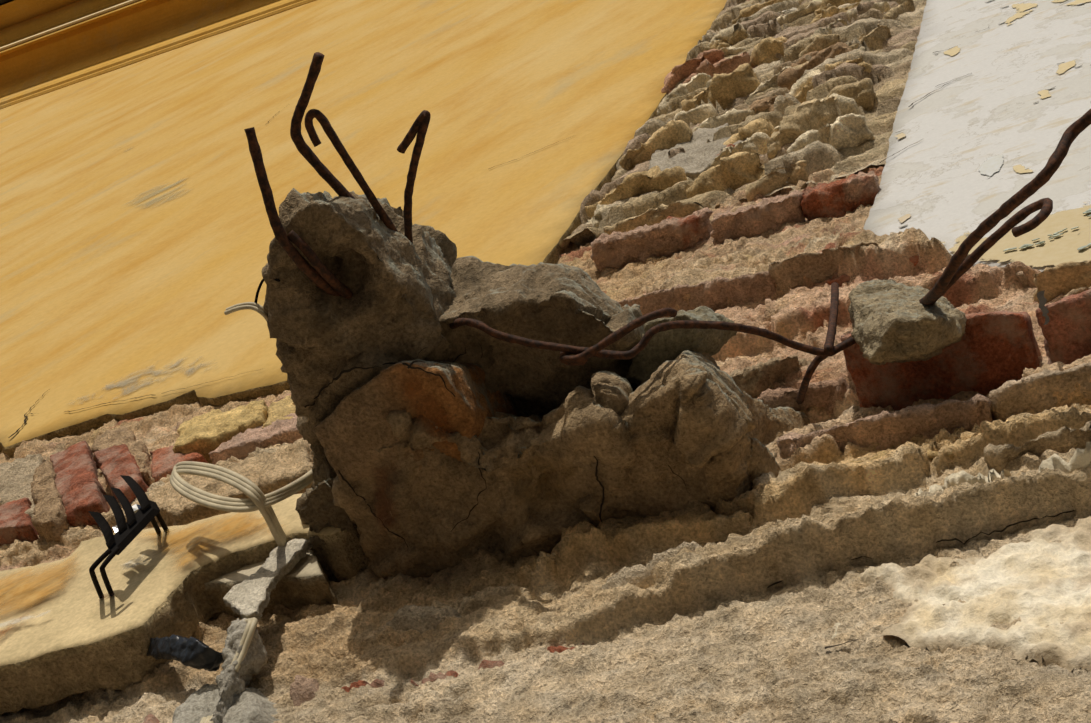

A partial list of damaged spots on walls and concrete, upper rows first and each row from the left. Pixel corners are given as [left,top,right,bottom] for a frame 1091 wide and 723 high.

crack [8,390,48,438]
spalling [0,390,313,627]
flaking render [244,0,1091,723]
flaking render [0,613,242,723]